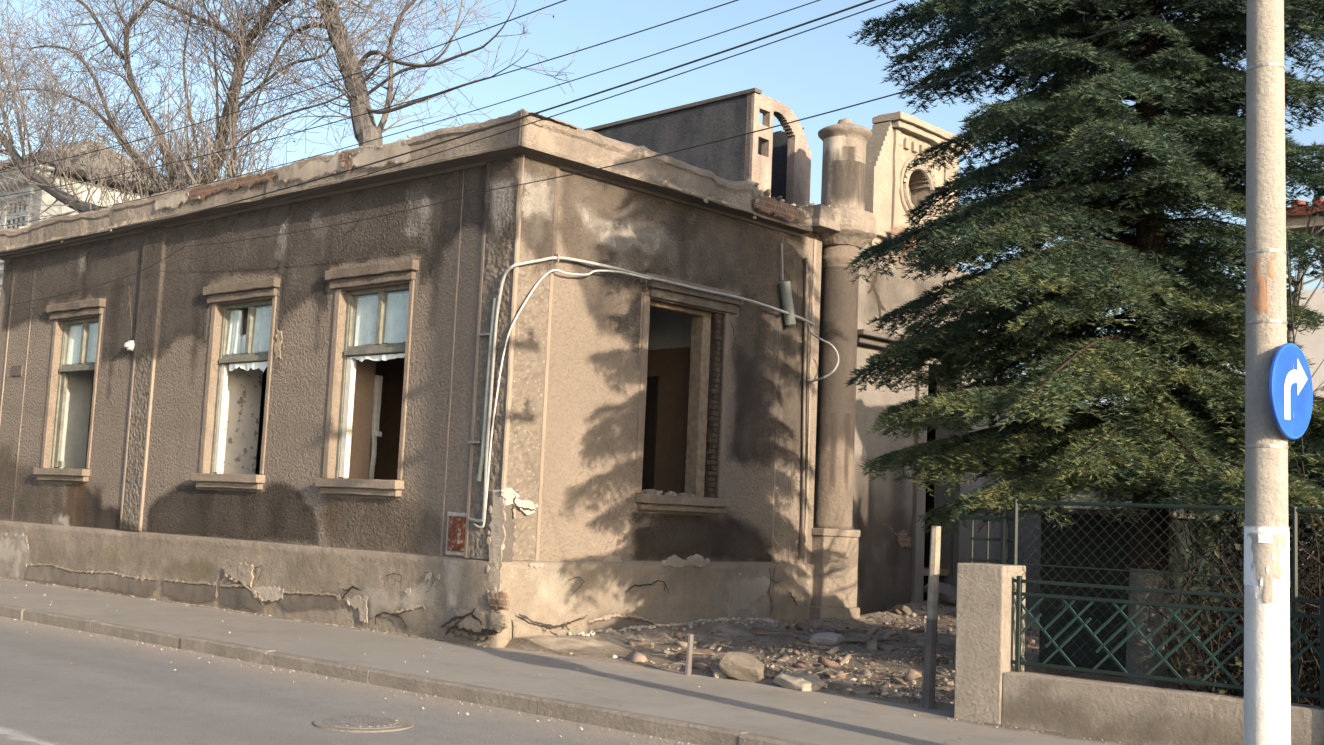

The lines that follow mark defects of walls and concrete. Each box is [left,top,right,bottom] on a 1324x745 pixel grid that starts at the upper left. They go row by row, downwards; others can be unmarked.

flaking render [334,151,360,174]
flaking render [753,192,806,222]
leakage [3,155,848,477]
corrosion [1251,258,1274,311]
leakage [0,457,426,553]
flaking render [0,533,440,629]
flaking render [485,487,538,633]
crack [627,580,670,594]